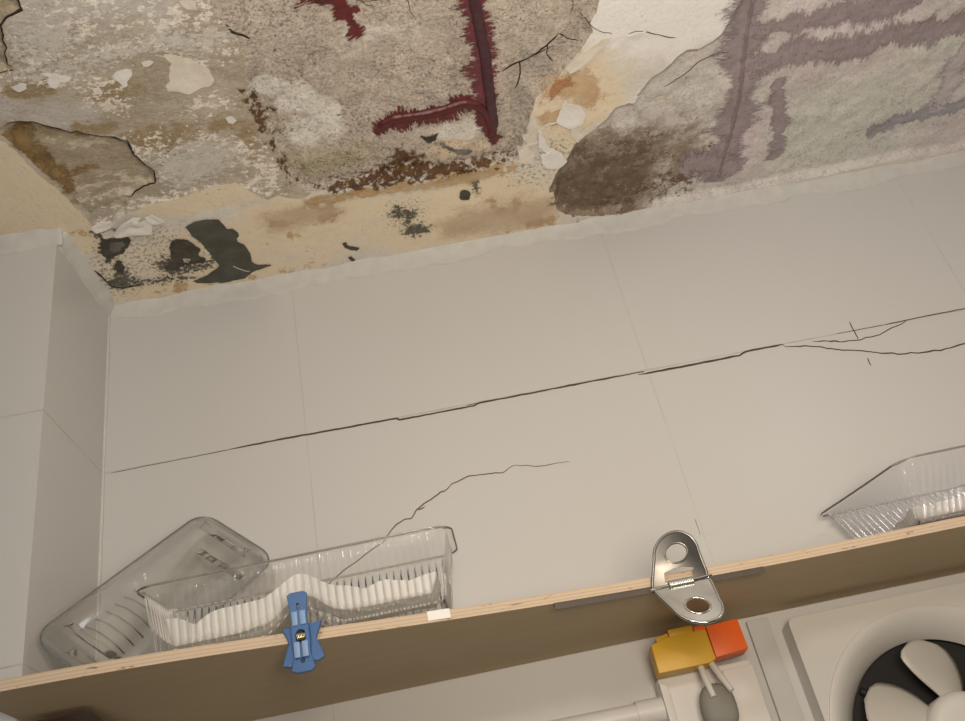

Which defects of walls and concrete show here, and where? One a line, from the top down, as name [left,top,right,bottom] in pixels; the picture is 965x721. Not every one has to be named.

crack [503,0,675,88]
crack [664,52,729,87]
spalling [0,0,965,239]
mould [86,228,215,290]
spalling [186,219,271,283]
leakage [386,202,553,239]
leakage [460,180,481,201]
crack [113,308,965,473]
crack [328,461,570,584]